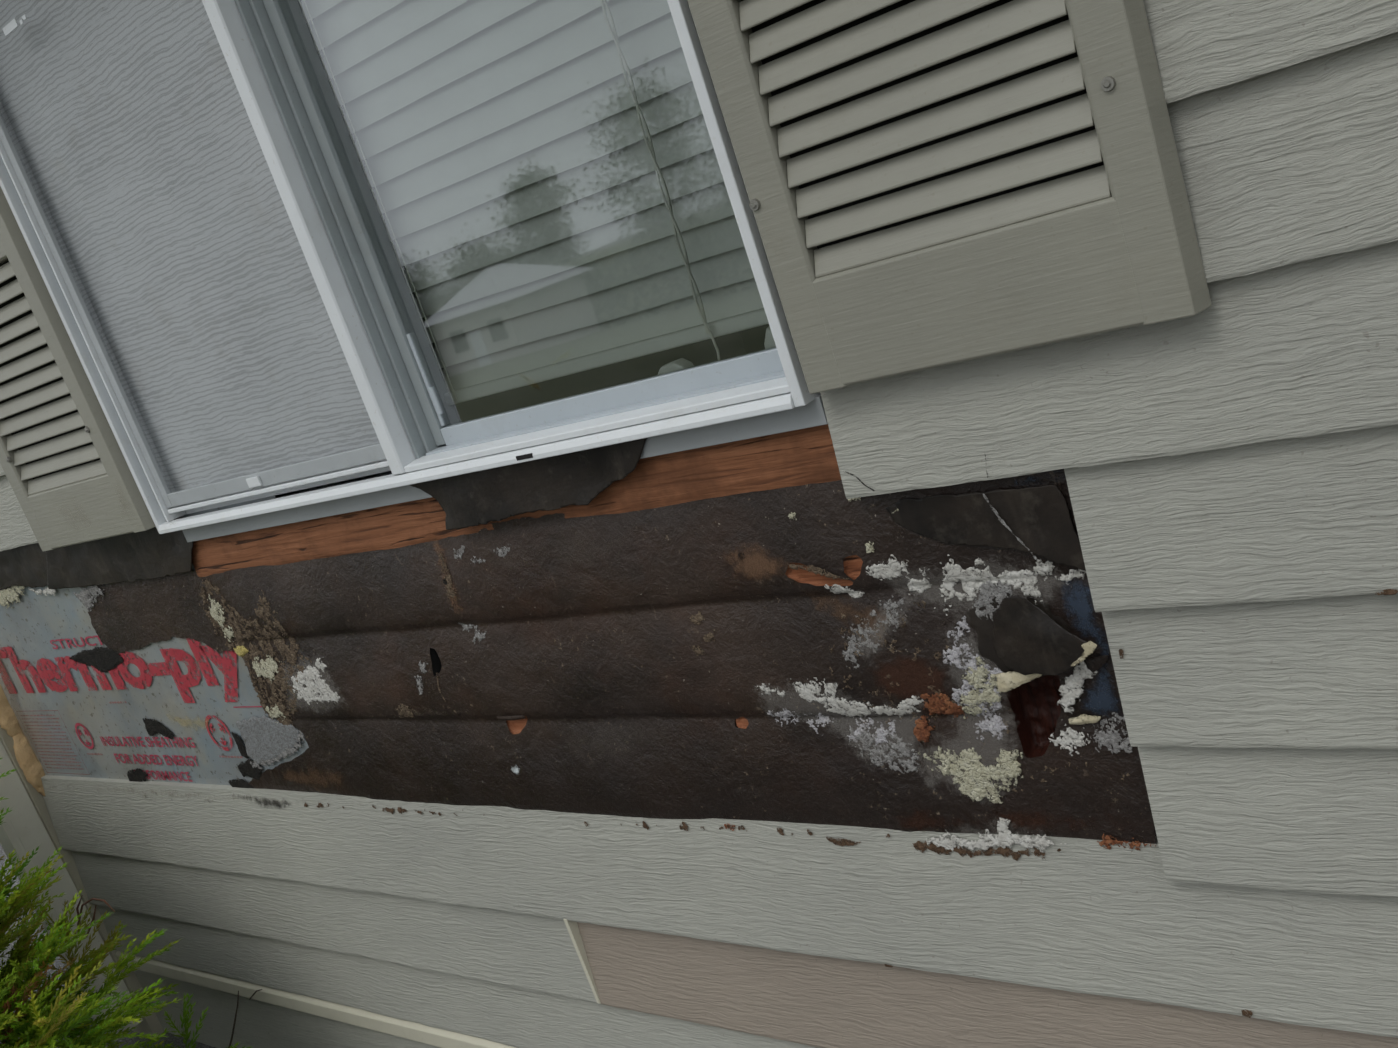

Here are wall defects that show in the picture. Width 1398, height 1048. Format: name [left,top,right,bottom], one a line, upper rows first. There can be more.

peeling [453,544,511,564]
peeling [0,585,56,609]
peeling [73,585,104,612]
peeling [459,623,486,644]
peeling [70,647,124,673]
peeling [194,577,340,788]
peeling [396,661,428,718]
leakage [874,659,944,705]
peeling [756,485,1133,861]
peeling [143,718,174,740]
peeling [127,768,148,782]